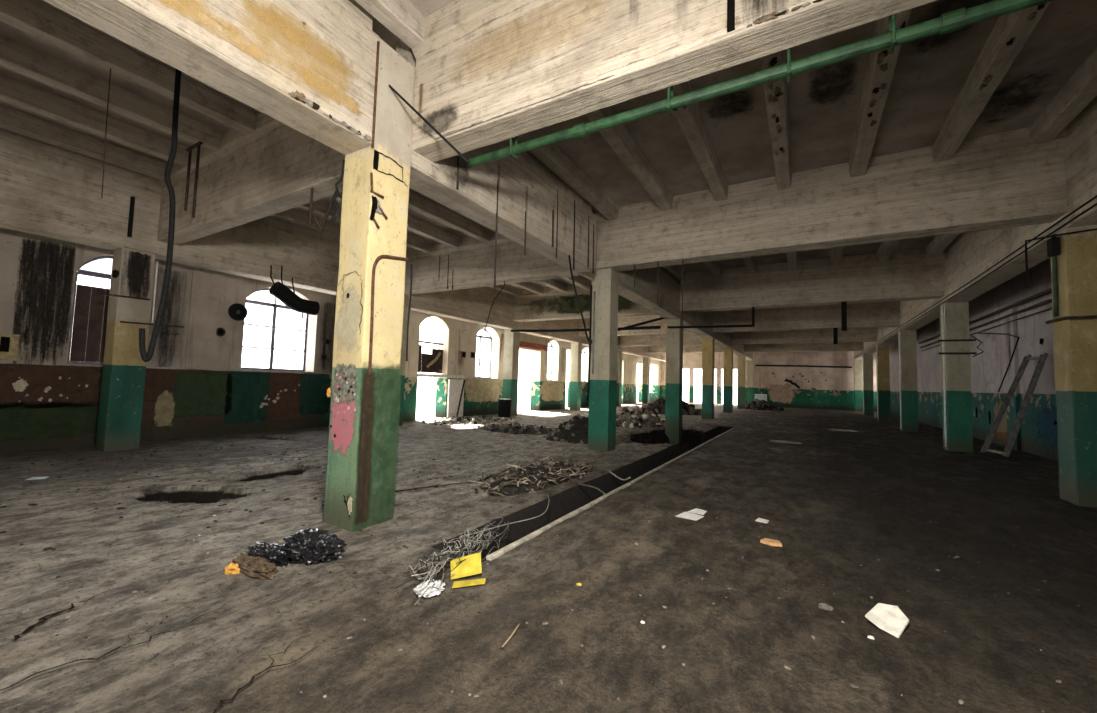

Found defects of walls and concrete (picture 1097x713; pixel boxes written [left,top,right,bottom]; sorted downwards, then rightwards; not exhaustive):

leakage [165,0,358,113]
leakage [811,60,856,103]
spalling [370,195,383,221]
leakage [13,239,76,364]
peeling [0,364,102,408]
peeling [326,363,357,456]
crack [14,590,110,639]
crack [0,599,237,691]
crack [213,636,318,713]